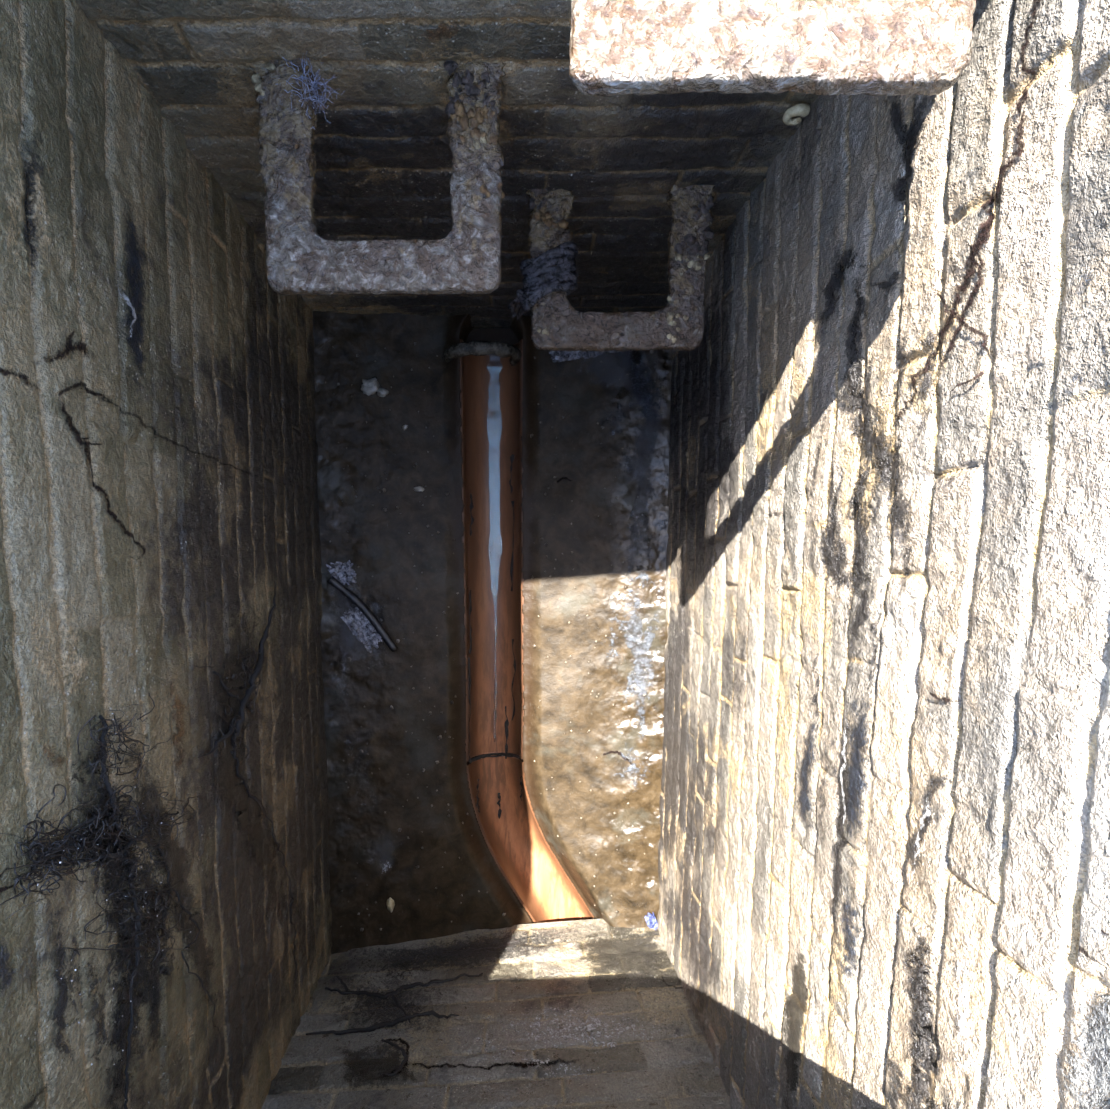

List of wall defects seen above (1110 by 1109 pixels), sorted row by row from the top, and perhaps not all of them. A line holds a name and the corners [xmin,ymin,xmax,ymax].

water stain [885,95,929,226]
crack [893,0,1041,428]
crack [0,331,258,559]
water stain [569,350,663,426]
crack [922,466,970,481]
water stain [798,248,938,976]
water stain [31,743,219,1109]
crack [381,1038,579,1077]
water stain [782,953,809,1109]
water stain [885,936,942,1109]
water stain [953,899,978,1073]